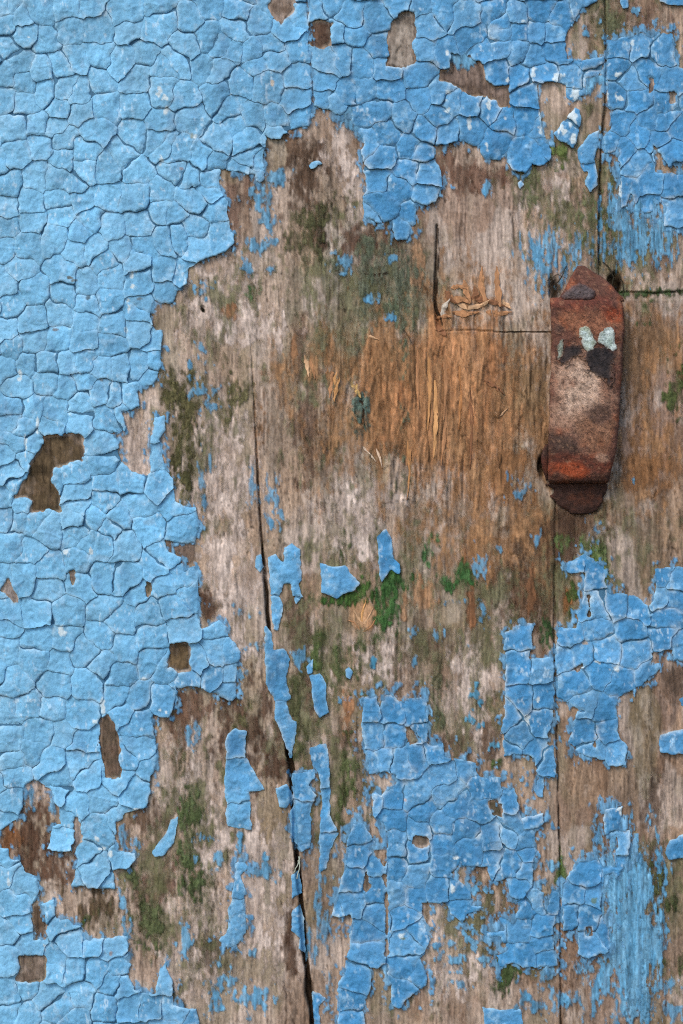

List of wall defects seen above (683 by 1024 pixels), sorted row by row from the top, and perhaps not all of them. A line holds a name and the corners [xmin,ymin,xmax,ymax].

crack [434,228,442,324]
peeling [0,0,605,889]
crack [262,548,271,631]
crack [279,729,295,809]
peeling [0,554,683,1024]
crack [293,845,314,1024]